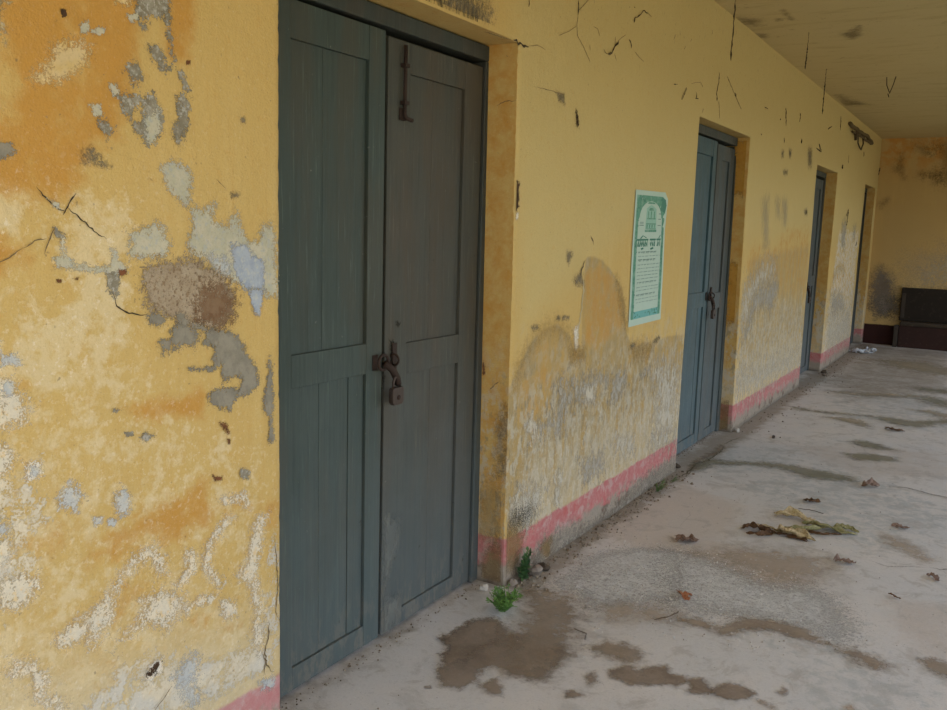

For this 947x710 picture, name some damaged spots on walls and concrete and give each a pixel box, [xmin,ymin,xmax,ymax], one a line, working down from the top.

peeling [31,19,106,87]
peeling [88,102,117,141]
peeling [109,0,192,149]
damp [426,0,493,23]
crack [0,188,147,316]
peeling [124,158,279,444]
peeling [0,346,46,483]
peeling [0,523,43,616]
peeling [93,482,133,528]
peeling [50,490,272,657]
damp [482,456,676,581]
spalling [141,655,165,685]